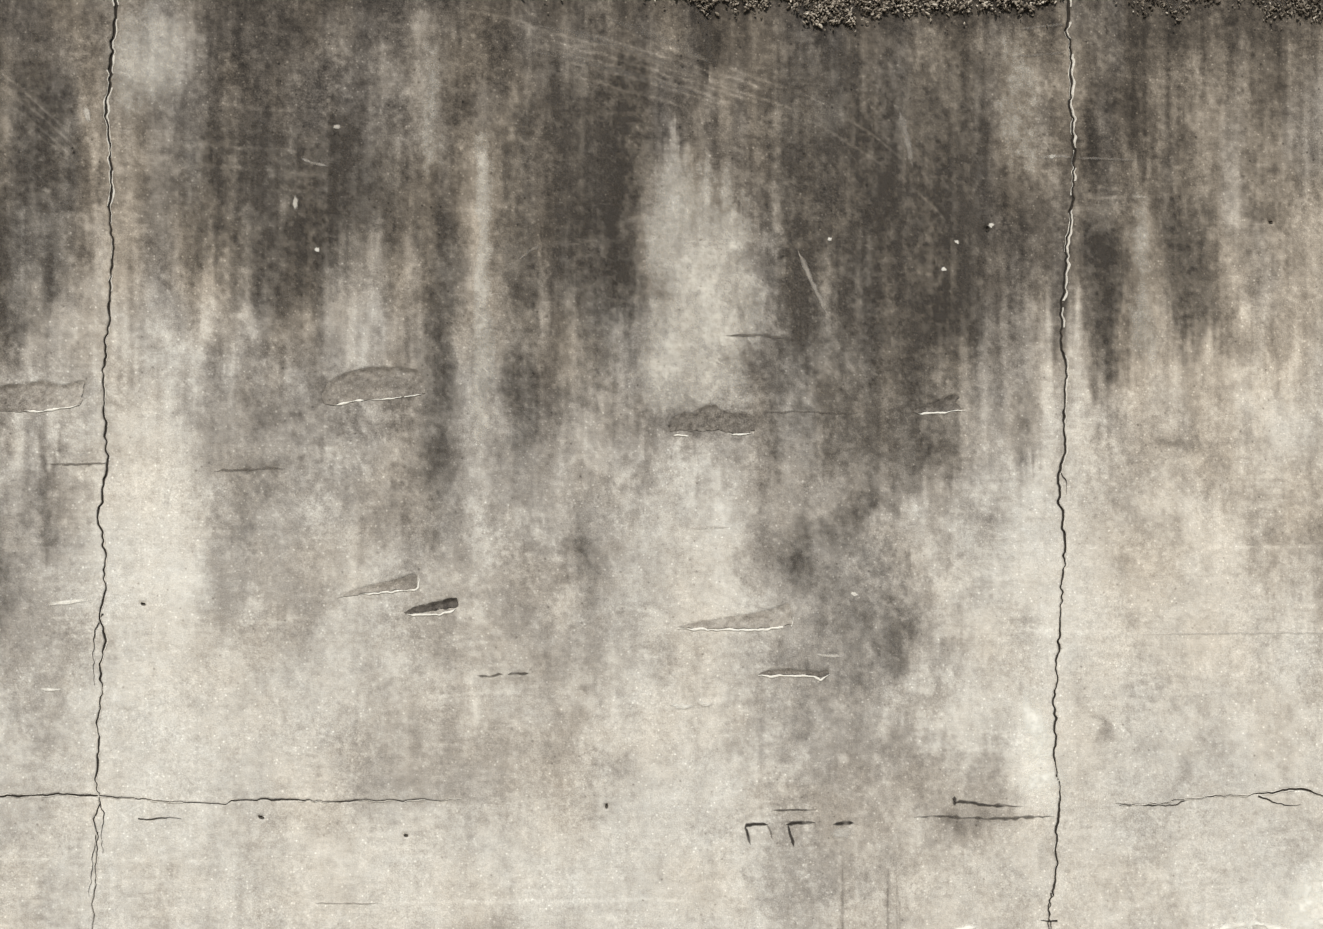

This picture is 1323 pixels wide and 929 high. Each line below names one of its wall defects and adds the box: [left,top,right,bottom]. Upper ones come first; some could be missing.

damp [0,53,79,339]
damp [202,114,397,306]
damp [503,55,650,308]
damp [763,31,990,459]
spalling [0,380,84,413]
crack [0,0,458,929]
spalling [322,367,425,405]
spalling [668,404,756,437]
crack [918,0,1077,929]
spalling [339,574,458,616]
spalling [678,603,794,631]
crack [1120,787,1323,806]